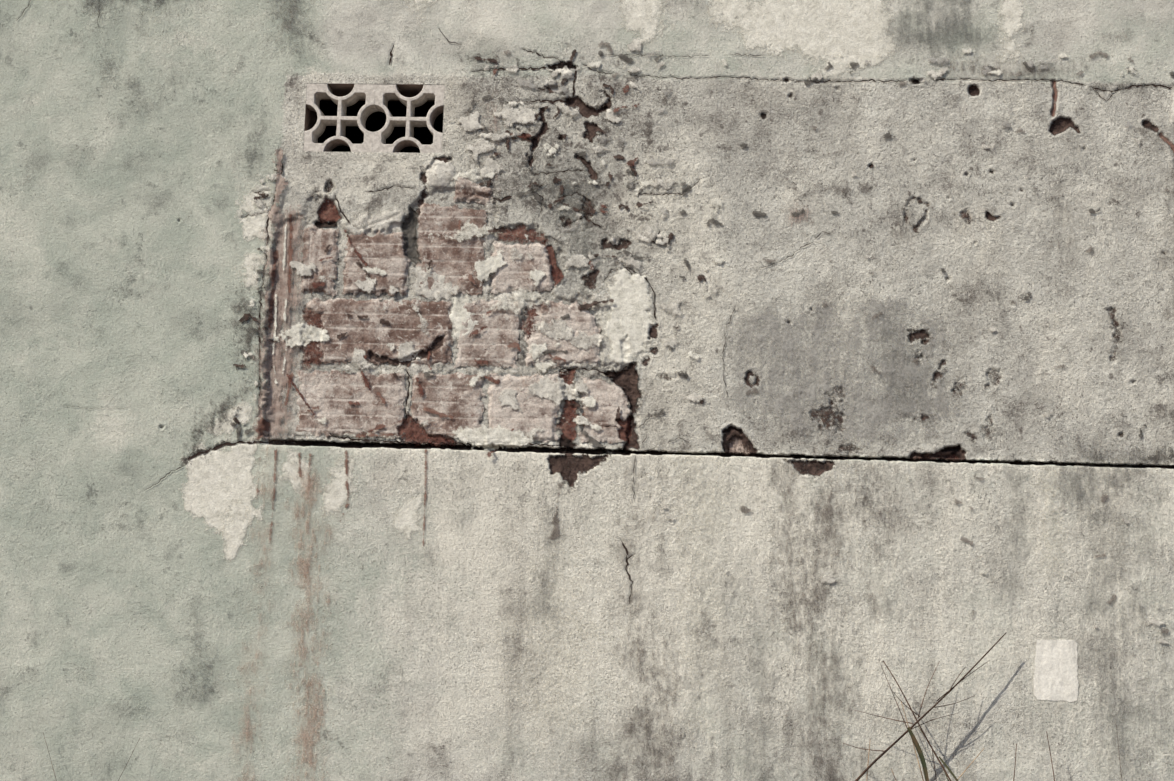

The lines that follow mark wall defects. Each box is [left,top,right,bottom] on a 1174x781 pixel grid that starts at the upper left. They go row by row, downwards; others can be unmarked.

crack [472,49,905,104]
peeling [709,0,896,85]
peeling [962,0,1067,96]
crack [933,78,1172,101]
spalling [1049,80,1080,135]
flaking render [179,0,699,561]
crack [144,166,1174,502]
spalling [722,426,758,456]
spalling [784,388,859,477]
spalling [905,414,992,462]
water stain [547,483,564,543]
crack [622,542,633,604]